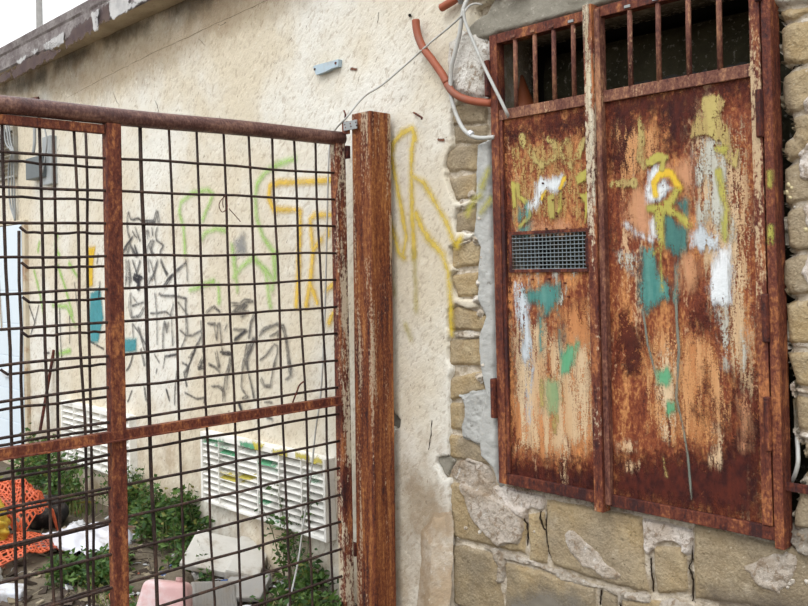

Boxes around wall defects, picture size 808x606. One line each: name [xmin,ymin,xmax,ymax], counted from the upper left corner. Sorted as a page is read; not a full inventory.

peeling [775,0,808,13]
peeling [0,0,146,82]
corrosion [504,109,585,172]
corrosion [605,78,751,175]
peeling [798,143,808,180]
peeling [784,182,808,232]
corrosion [510,302,594,490]
corrosion [611,305,762,524]
crack [524,511,551,556]
crack [648,558,656,592]
crack [687,529,695,601]